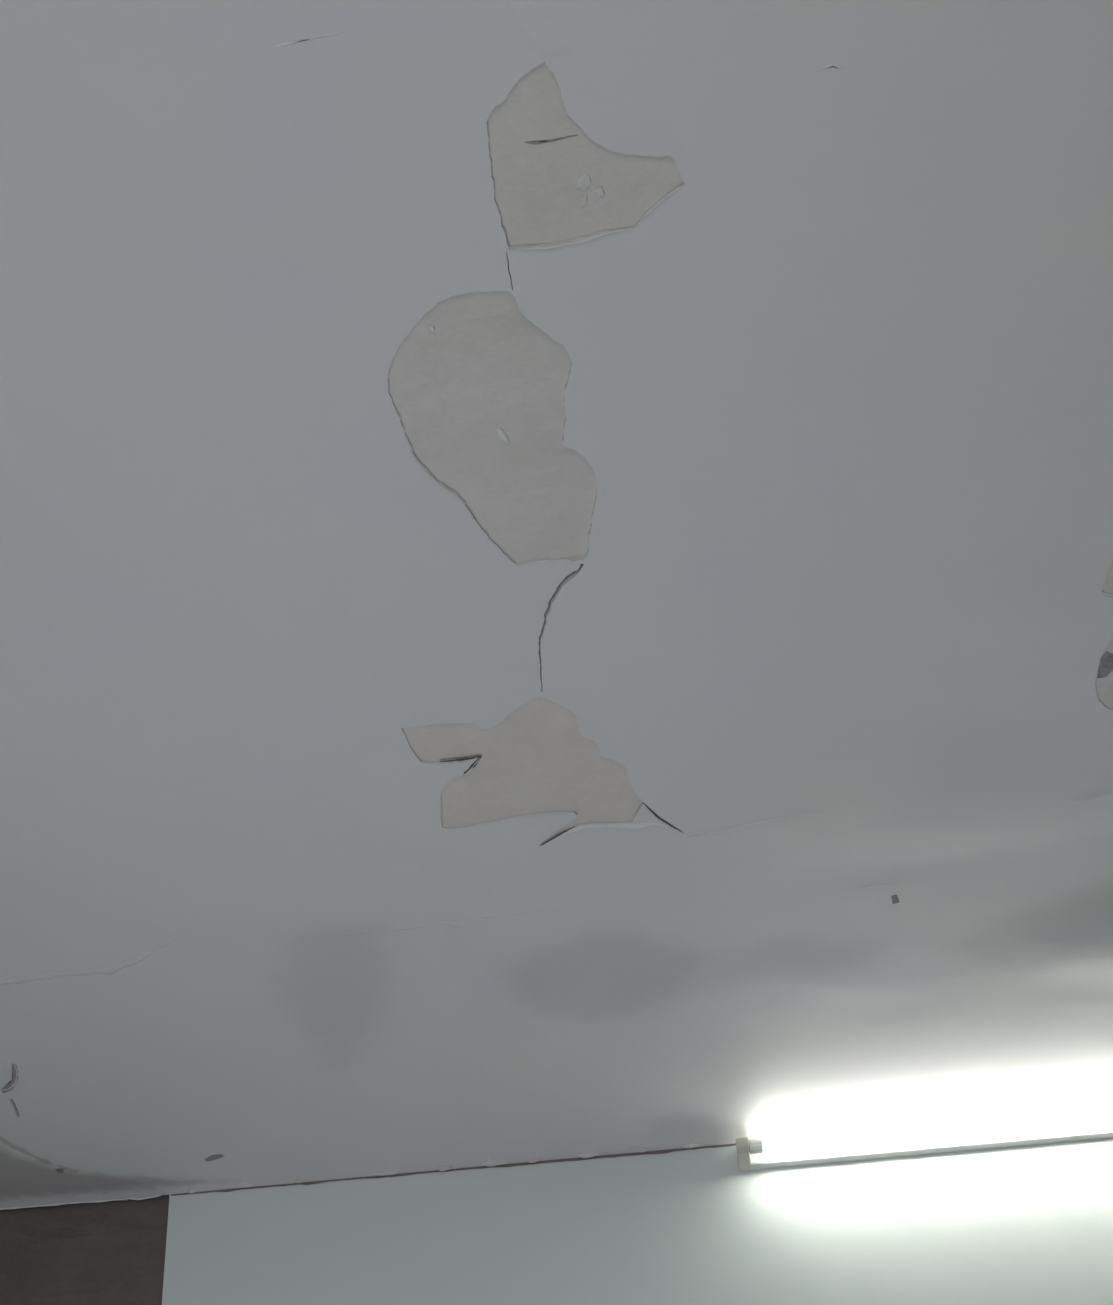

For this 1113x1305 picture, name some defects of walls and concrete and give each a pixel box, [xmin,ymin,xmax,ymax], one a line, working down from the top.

crack [539,564,582,691]
peeling [1095,640,1113,709]
peeling [402,697,685,846]